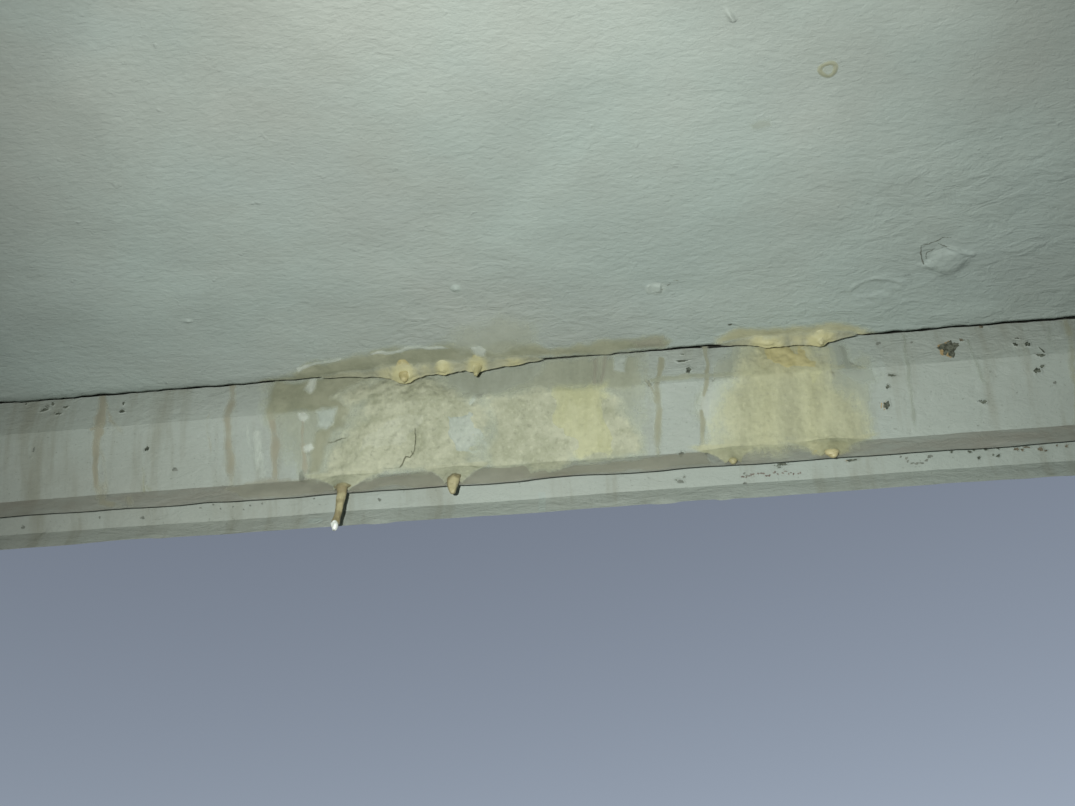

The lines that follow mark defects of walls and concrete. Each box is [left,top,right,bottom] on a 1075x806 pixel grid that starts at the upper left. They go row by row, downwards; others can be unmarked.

crack [855,316,1075,335]
crack [541,344,742,360]
peeling [936,337,965,358]
crack [44,380,286,400]
damp [265,323,873,491]
rust [224,384,235,473]